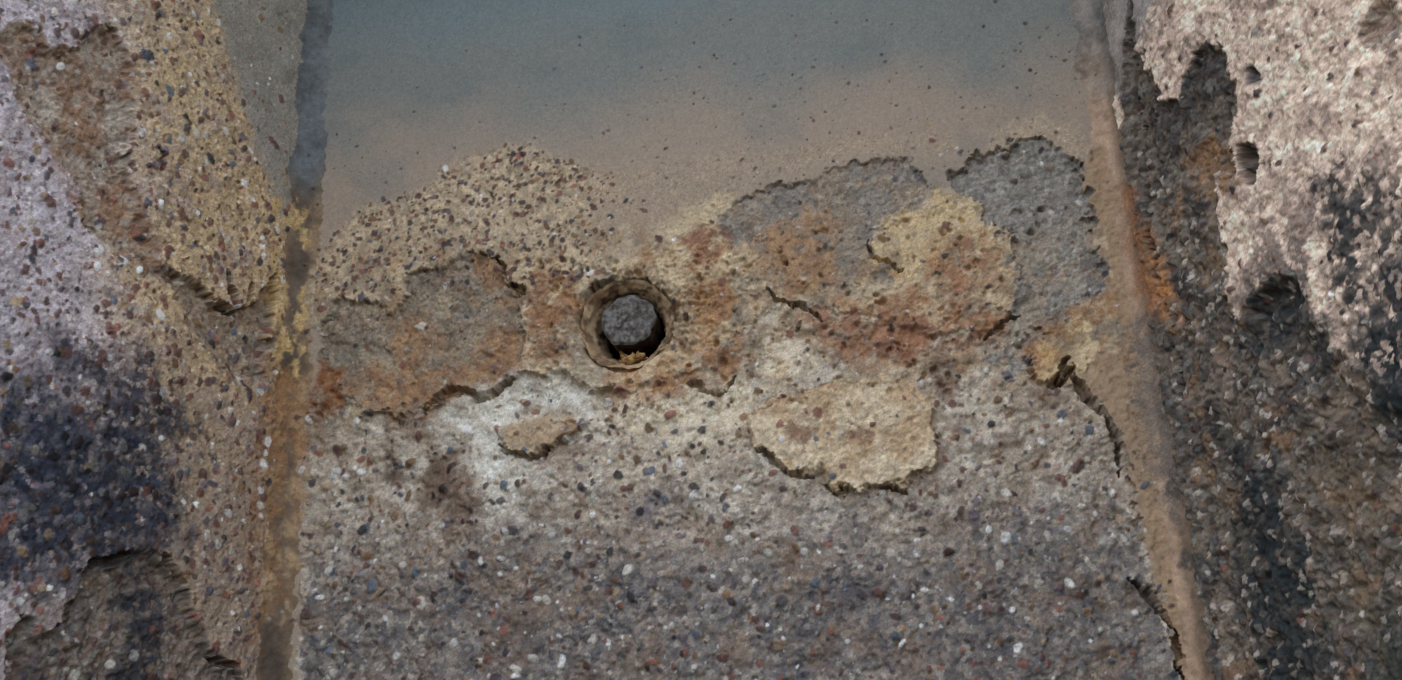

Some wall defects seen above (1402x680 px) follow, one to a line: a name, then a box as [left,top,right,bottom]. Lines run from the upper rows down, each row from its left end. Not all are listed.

spalling [0,544,246,680]
spalling [0,17,279,394]
rust [237,249,585,659]
spalling [292,135,1182,680]
crack [1047,355,1126,478]
crack [1127,576,1187,680]
spalling [1117,0,1402,680]